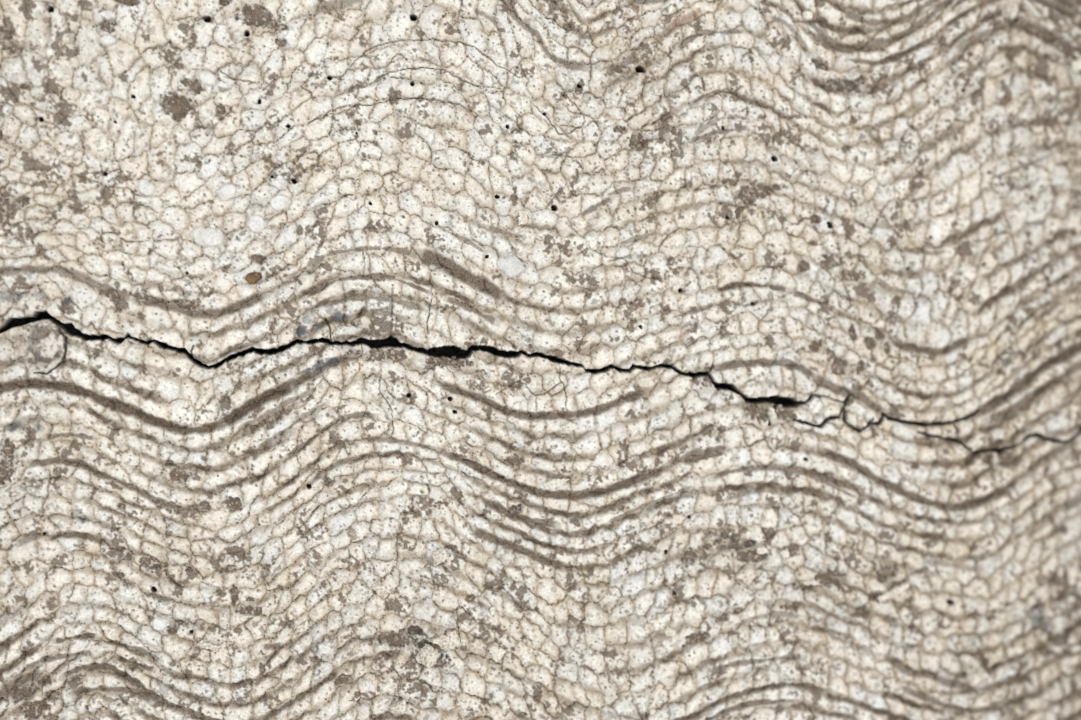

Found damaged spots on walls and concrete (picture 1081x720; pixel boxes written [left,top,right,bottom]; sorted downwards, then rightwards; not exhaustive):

crack [0,128,183,292]
crack [346,122,592,264]
crack [931,183,1081,314]
crack [0,457,255,720]
crack [326,517,444,673]
crack [355,597,591,720]
crack [524,414,674,527]
crack [498,528,797,692]
crack [569,465,727,551]
crack [598,644,754,720]
crack [741,486,842,574]
crack [737,556,936,720]